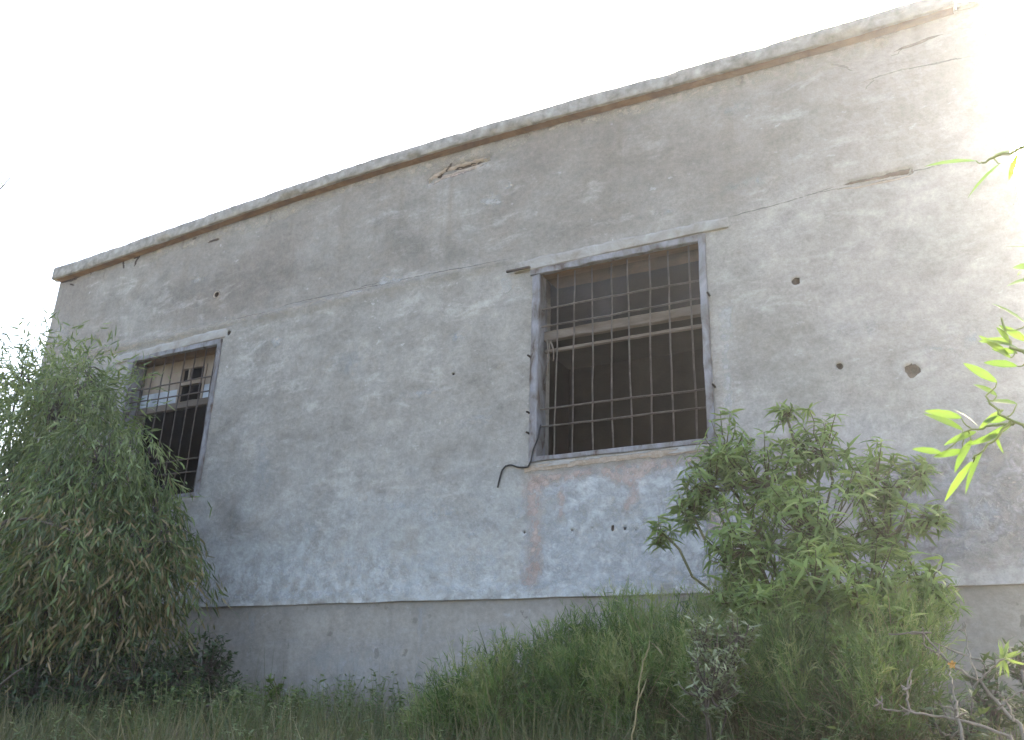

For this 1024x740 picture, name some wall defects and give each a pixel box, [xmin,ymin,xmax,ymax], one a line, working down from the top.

crack [834,34,971,88]
spalling [427,157,489,186]
spalling [835,169,913,190]
spalling [898,358,927,383]